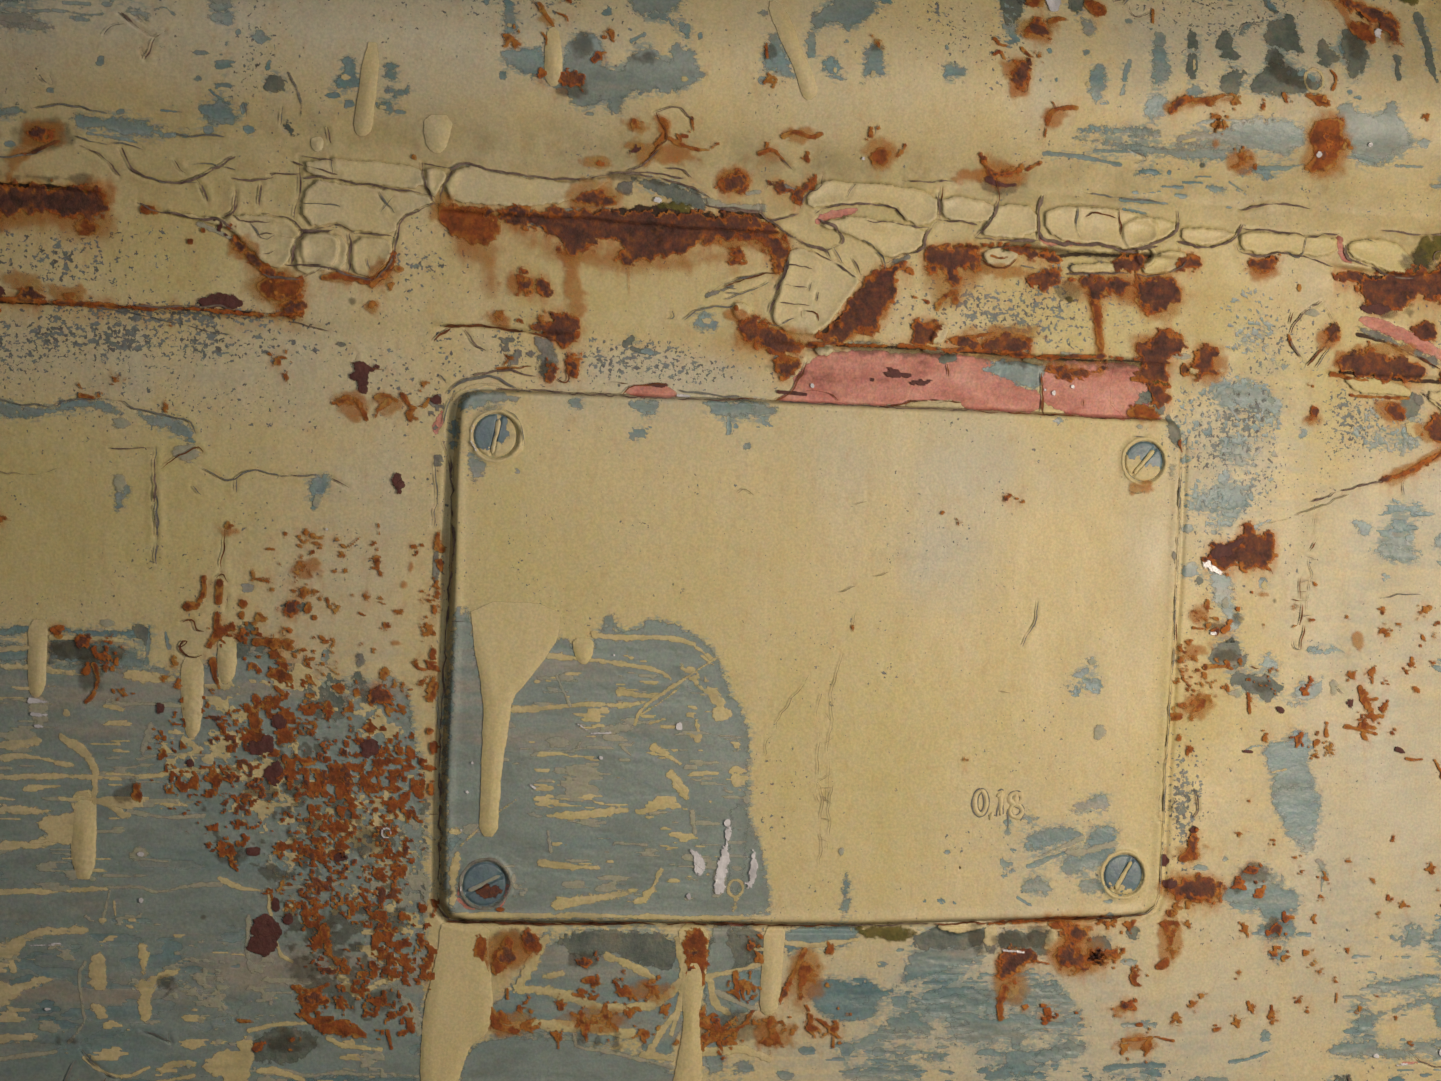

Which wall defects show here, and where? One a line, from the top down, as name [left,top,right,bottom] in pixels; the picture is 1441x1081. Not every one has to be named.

peeling [484,0,706,116]
corrosion [432,106,823,383]
crack [82,127,1441,326]
peeling [622,248,1283,535]
corrosion [806,242,1223,409]
crack [1288,301,1341,368]
corrosion [1202,519,1278,576]
peeling [0,624,429,1081]
corrosion [131,521,671,1066]
peeling [441,606,794,1081]
peeling [799,923,1166,1081]
corrosion [983,826,1227,1063]